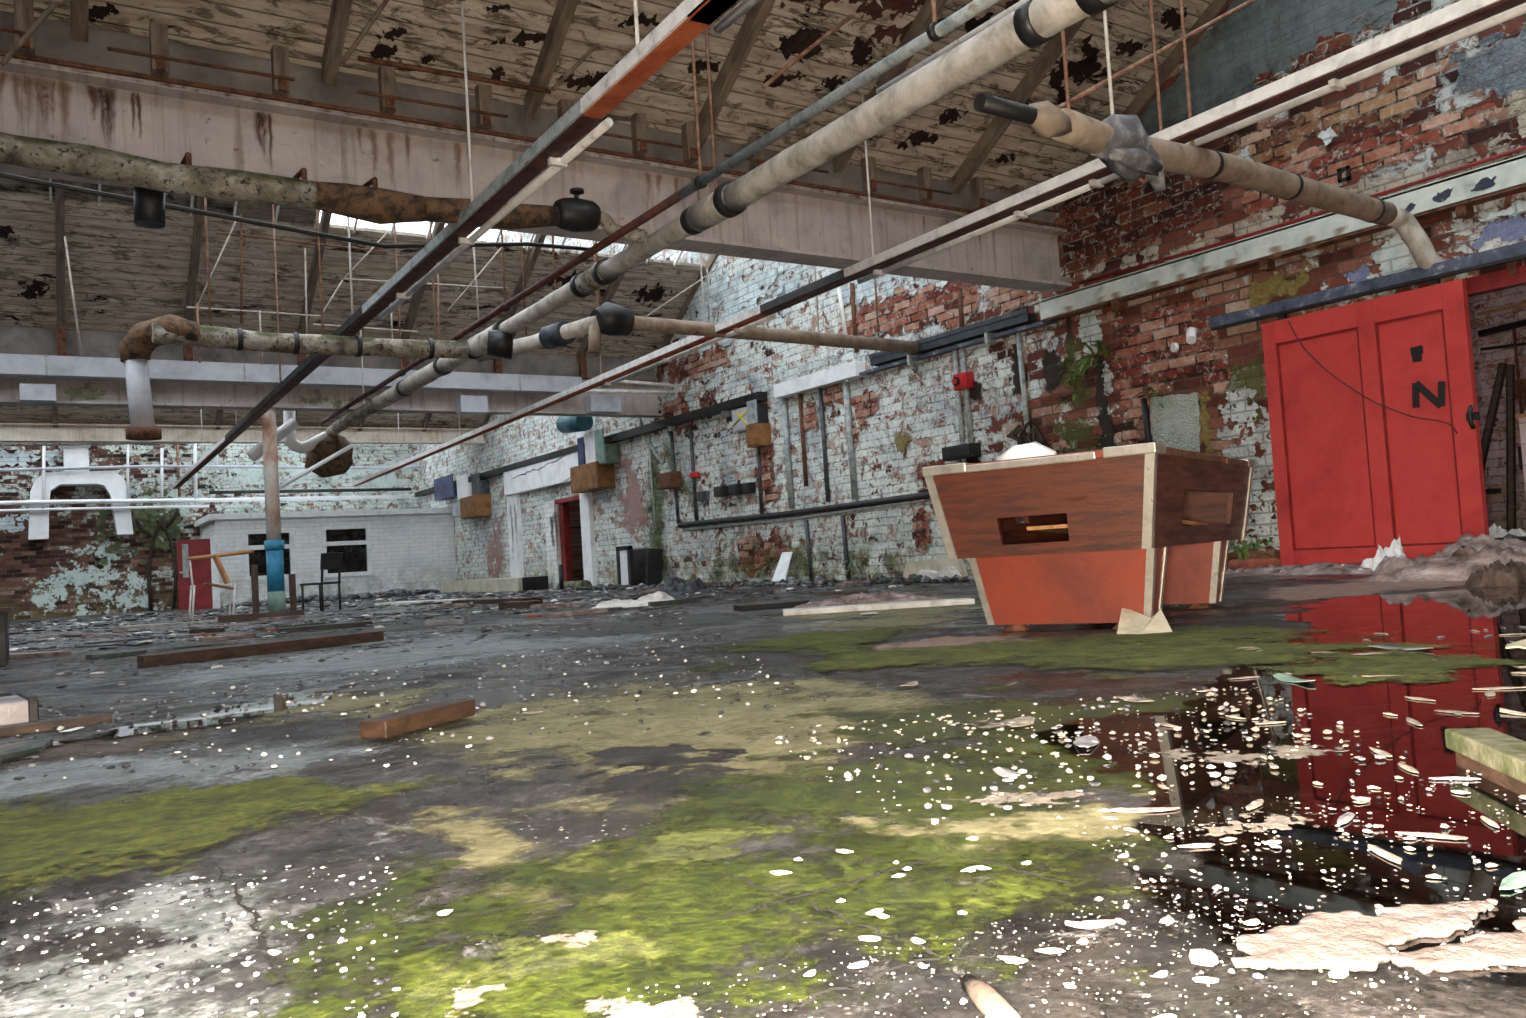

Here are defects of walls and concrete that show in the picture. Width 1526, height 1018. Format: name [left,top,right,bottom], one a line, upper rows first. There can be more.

peeling [763,0,926,96]
peeling [1139,0,1431,136]
spalling [1223,22,1526,212]
spalling [1057,171,1331,288]
peeling [631,264,799,436]
spalling [780,274,1036,445]
peeling [29,541,164,616]
water stain [0,588,983,923]
crack [1,952,119,992]
water stain [0,870,292,1018]
crack [163,865,294,984]
peeling [1189,871,1526,975]